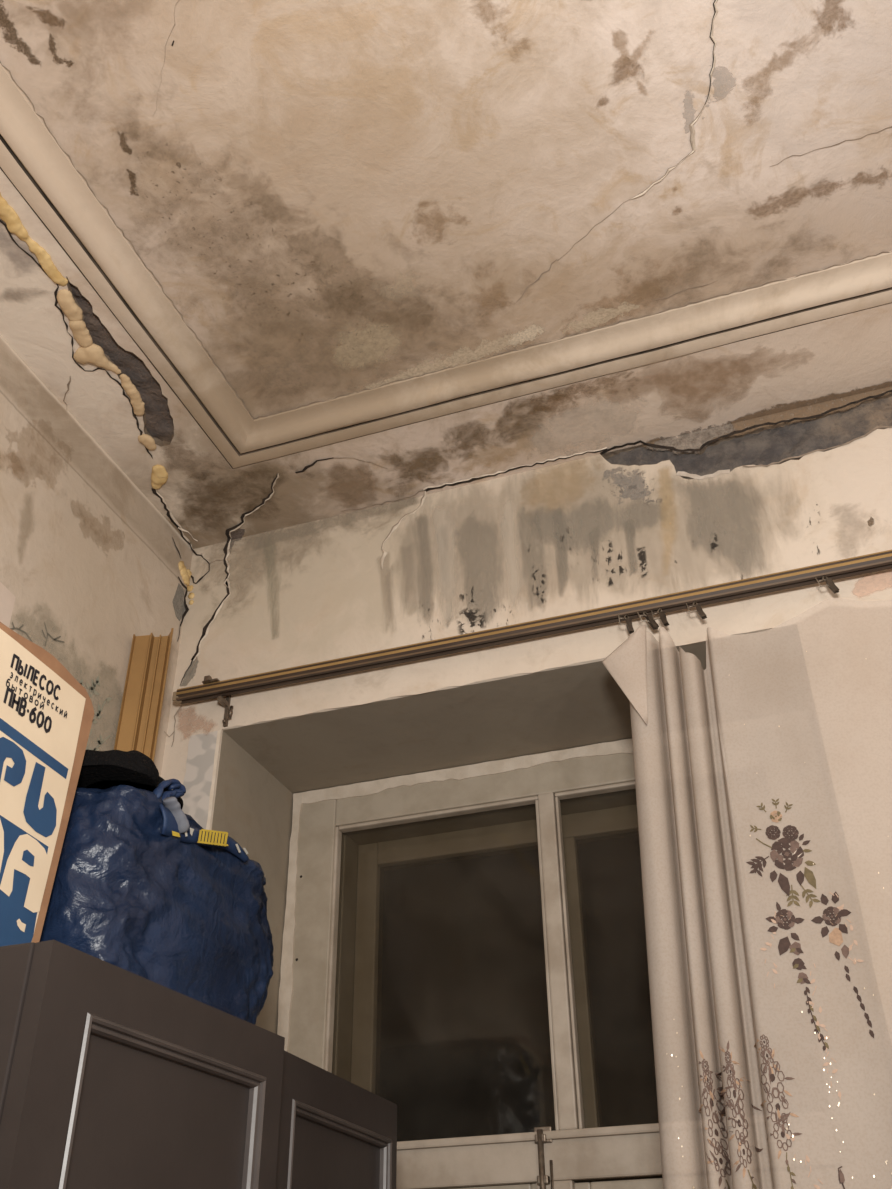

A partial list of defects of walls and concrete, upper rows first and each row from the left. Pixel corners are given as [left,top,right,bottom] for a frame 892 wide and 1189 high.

leakage [0,1,40,64]
leakage [29,7,73,67]
leakage [120,133,132,155]
crack [521,0,718,297]
crack [0,61,892,419]
spalling [66,277,174,446]
crack [0,193,387,747]
leakage [418,517,510,638]
crack [341,447,607,569]
leakage [391,391,636,482]
leakage [520,467,663,603]
spalling [600,390,892,479]